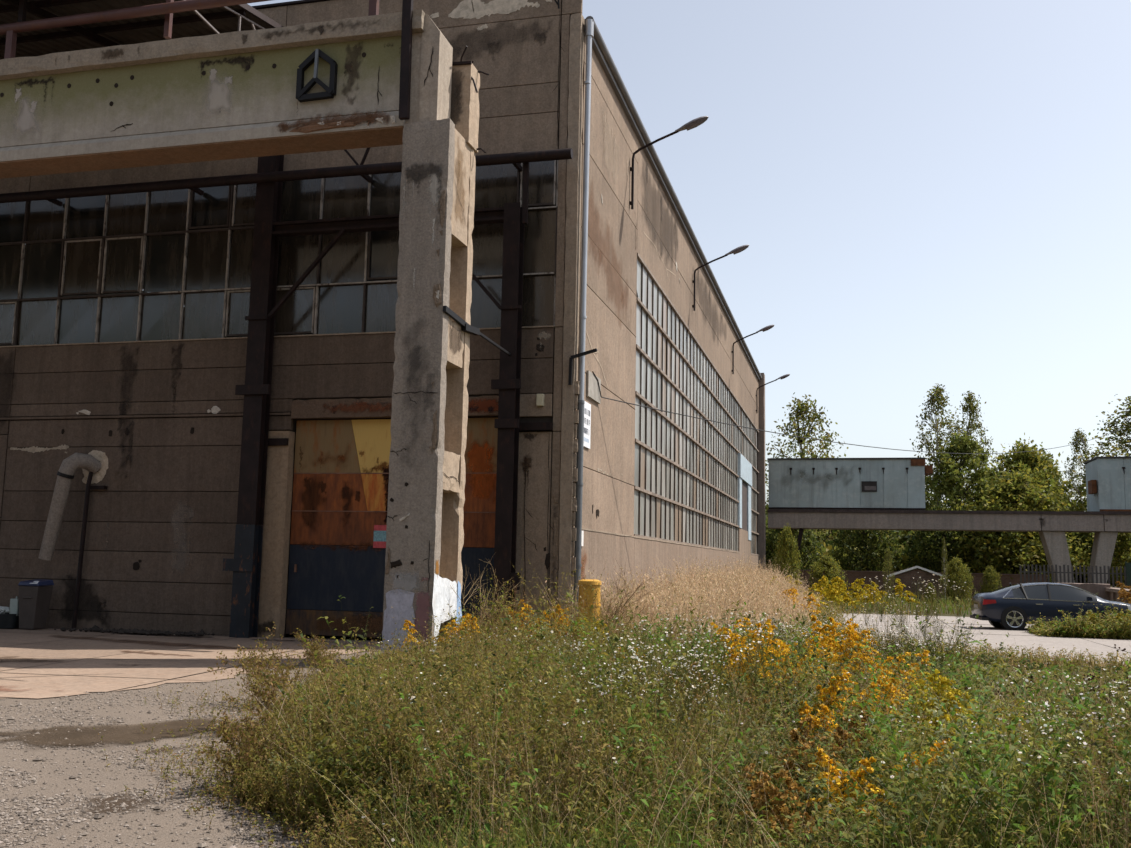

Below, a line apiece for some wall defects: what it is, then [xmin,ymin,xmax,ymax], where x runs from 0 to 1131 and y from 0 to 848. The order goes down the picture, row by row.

damp [266,23,356,38]
peeling [430,0,552,30]
damp [201,35,254,110]
damp [343,45,362,103]
corrosion [278,111,389,132]
damp [403,163,442,241]
corrosion [302,478,326,526]
corrosion [364,458,389,523]
corrosion [467,441,496,498]